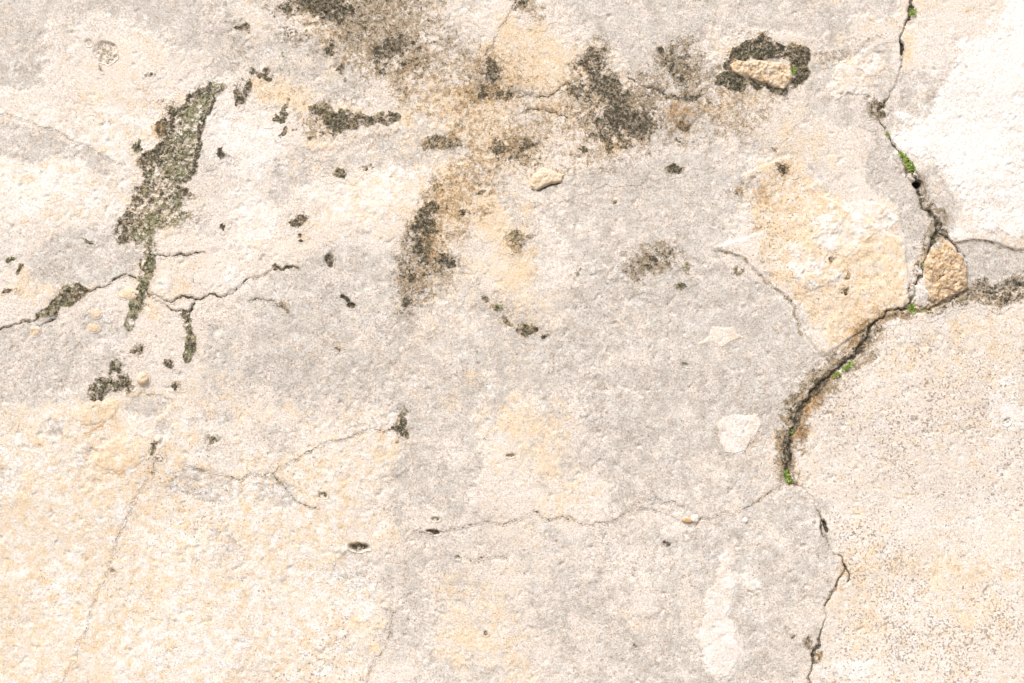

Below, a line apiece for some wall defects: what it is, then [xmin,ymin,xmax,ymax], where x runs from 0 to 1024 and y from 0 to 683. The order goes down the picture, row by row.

crack [0,295,59,332]
crack [90,251,300,317]
damp [180,0,814,563]
crack [404,0,984,683]